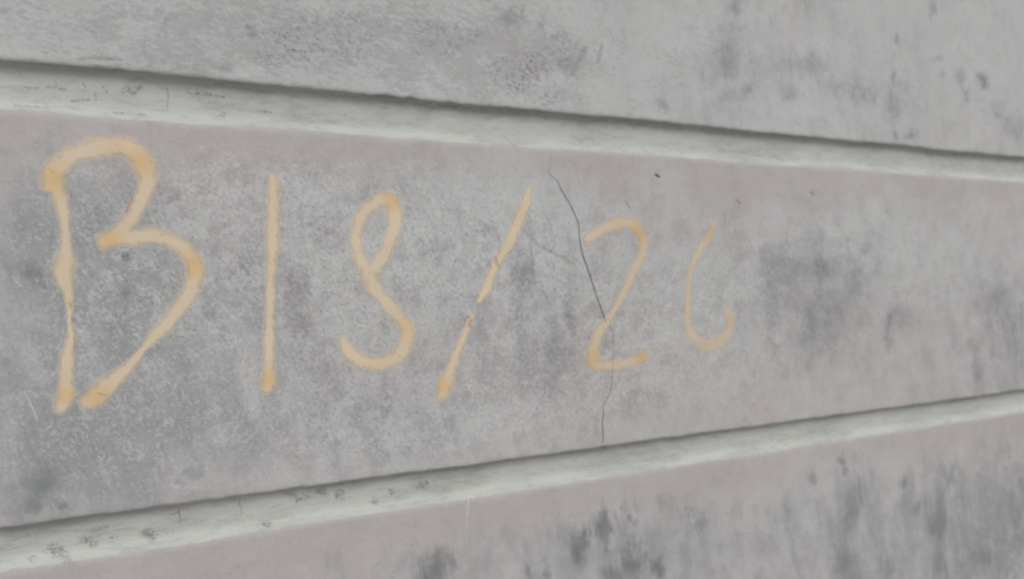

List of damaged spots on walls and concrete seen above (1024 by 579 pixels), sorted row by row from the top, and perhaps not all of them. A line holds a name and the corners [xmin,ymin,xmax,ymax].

crack [552,176,613,332]